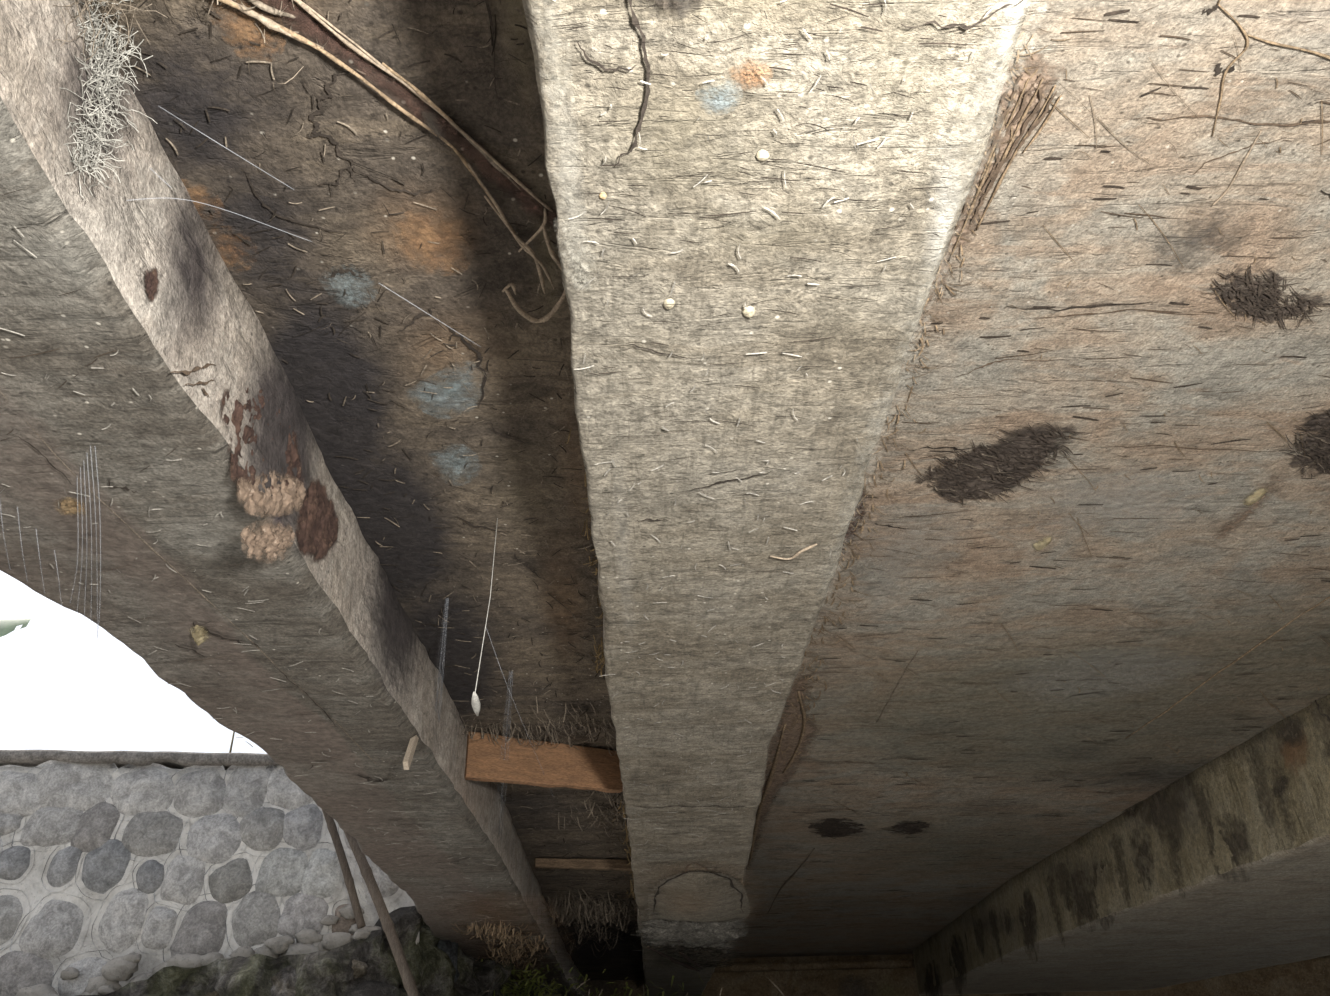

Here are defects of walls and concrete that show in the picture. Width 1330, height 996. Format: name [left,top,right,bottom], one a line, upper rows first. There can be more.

crack [577,0,650,165]
leakage [925,777,1248,996]